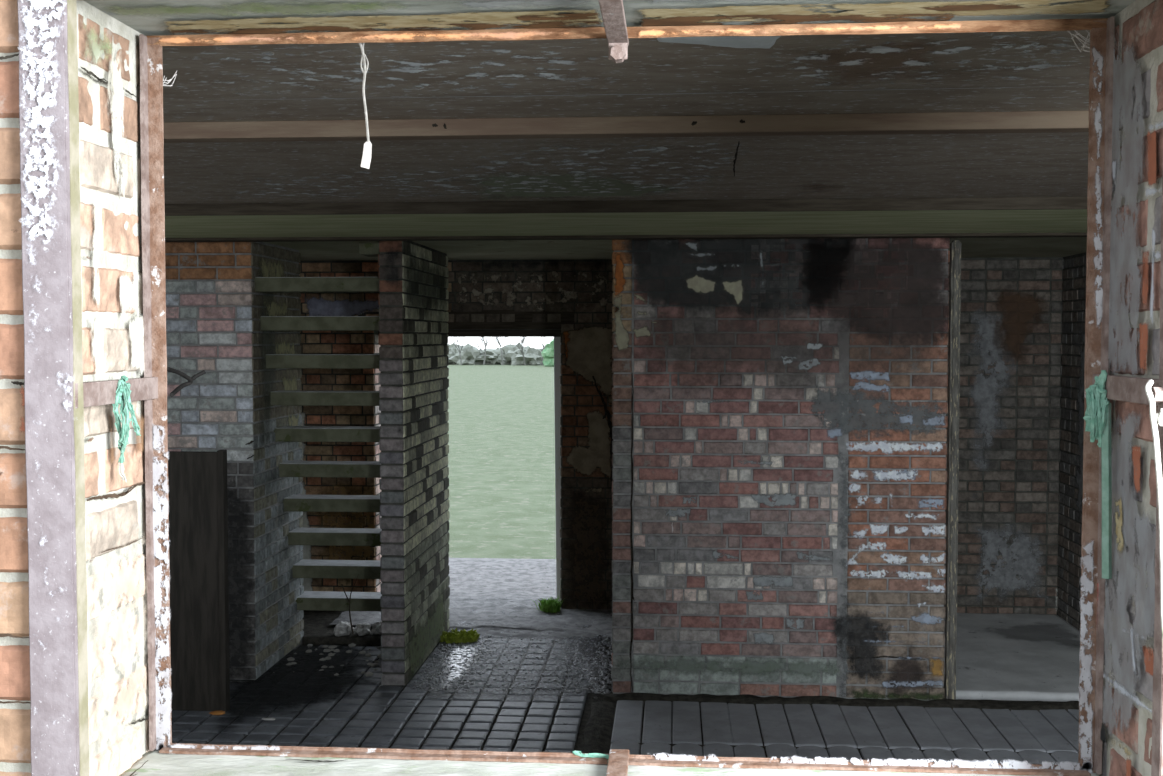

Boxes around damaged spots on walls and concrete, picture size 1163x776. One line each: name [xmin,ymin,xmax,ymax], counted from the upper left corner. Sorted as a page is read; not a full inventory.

peeling [20,0,66,263]
peeling [686,242,743,304]
peeling [1092,37,1157,376]
peeling [565,326,613,493]
peeling [850,371,890,392]
peeling [152,425,291,751]
damp [832,613,943,693]
peeling [772,414,1156,774]
peeling [654,753,719,761]